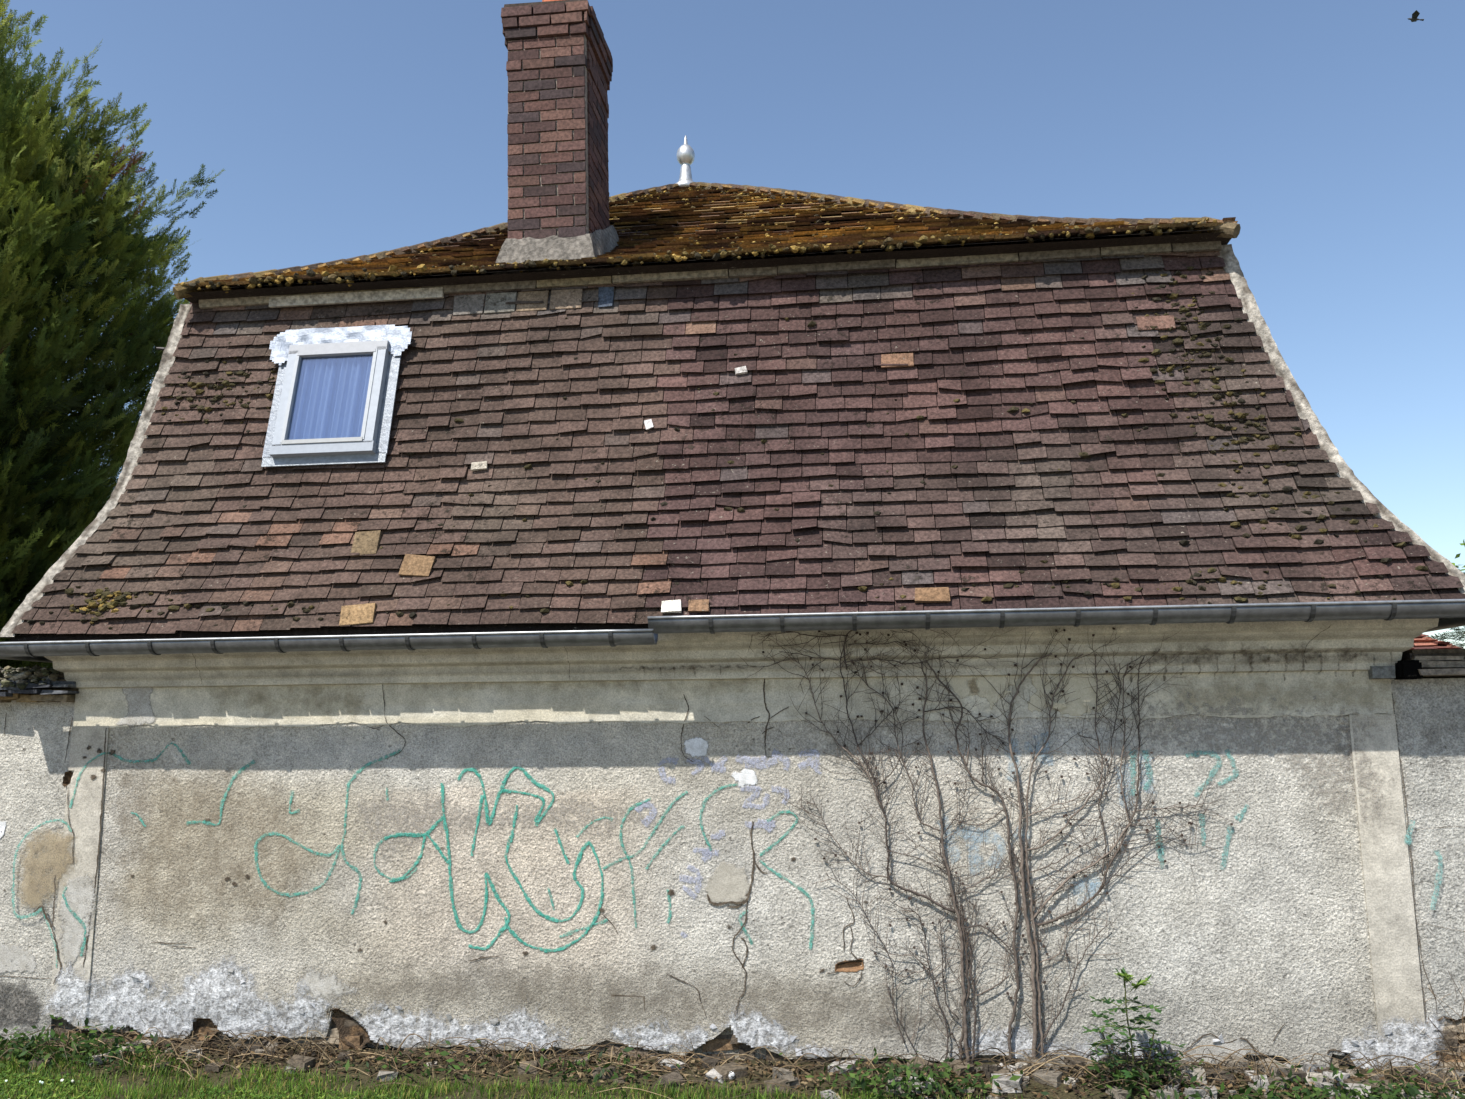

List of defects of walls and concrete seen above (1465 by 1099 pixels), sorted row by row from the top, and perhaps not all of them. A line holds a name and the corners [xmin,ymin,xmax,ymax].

water stain [41,958,569,1051]
crack [666,821,767,1021]
water stain [612,1011,865,1059]
spalling [820,958,864,973]